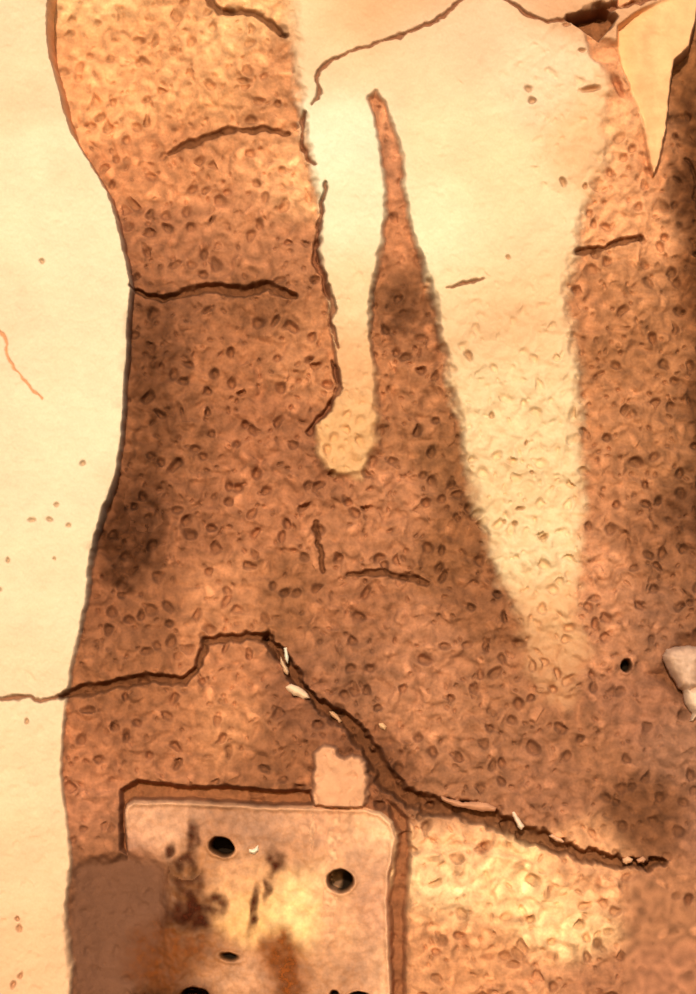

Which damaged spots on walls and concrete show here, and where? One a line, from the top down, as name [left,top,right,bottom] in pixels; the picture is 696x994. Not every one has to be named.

crack [503,0,652,28]
peeling [616,0,696,174]
crack [128,280,299,303]
crack [167,0,463,437]
peeling [297,78,388,480]
peeling [436,303,592,710]
crack [0,630,668,873]
rust [166,825,227,928]
rust [250,881,271,925]
rust [267,855,282,871]
rust [270,931,298,994]
spalling [405,848,627,994]